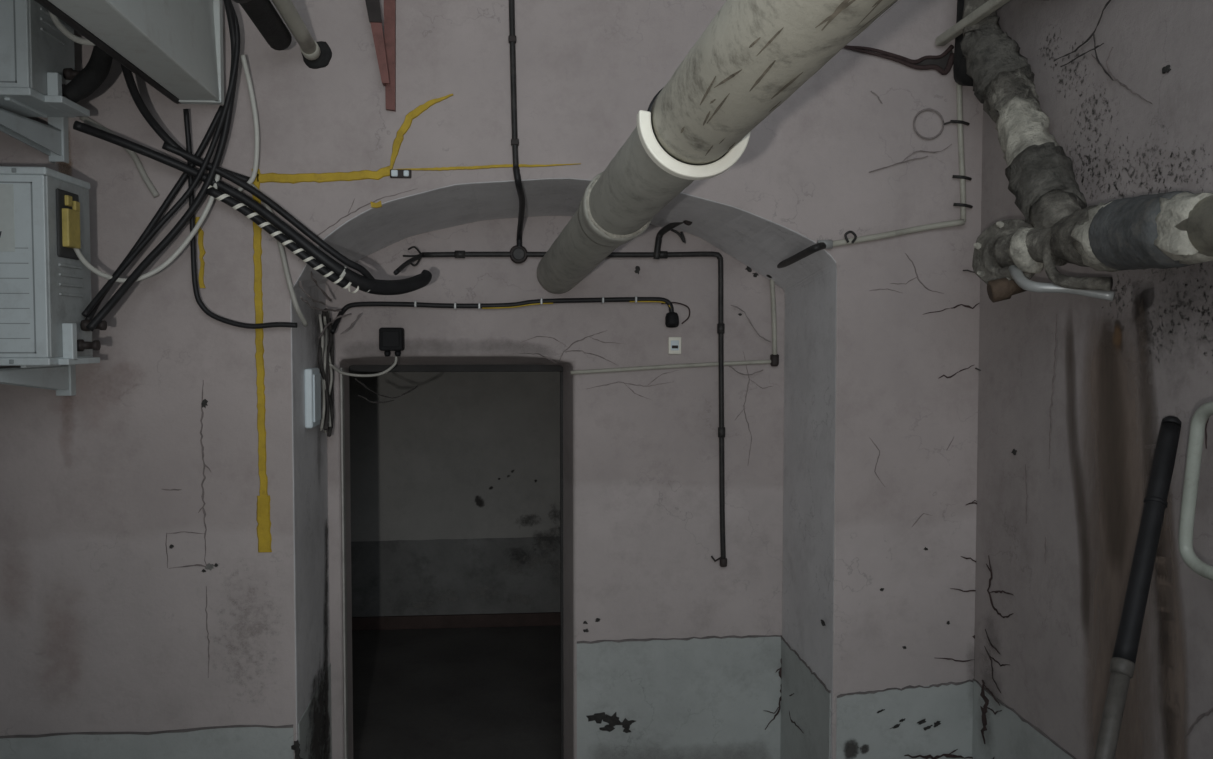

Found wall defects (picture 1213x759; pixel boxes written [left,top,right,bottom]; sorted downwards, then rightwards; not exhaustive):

crack [1091,47,1152,104]
water stain [1043,25,1212,198]
crack [870,253,979,314]
crack [162,380,220,673]
crack [904,555,1013,759]